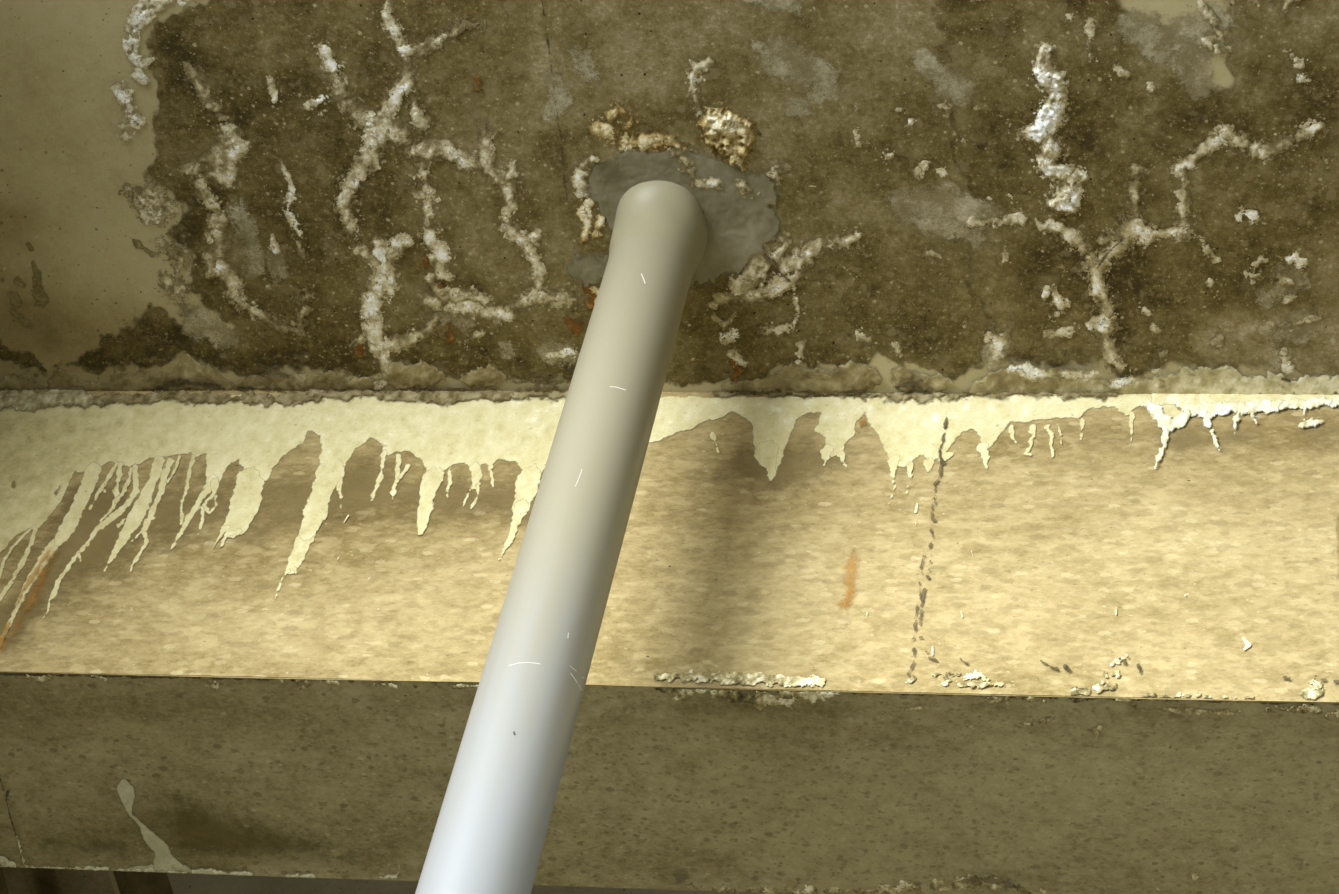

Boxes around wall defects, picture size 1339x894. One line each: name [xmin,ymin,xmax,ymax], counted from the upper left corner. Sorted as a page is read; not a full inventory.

damp [0,0,1339,638]
rust [842,558,855,606]
crack [728,379,1228,703]
crack [0,673,354,682]
crack [0,778,17,838]
damp [0,779,253,876]